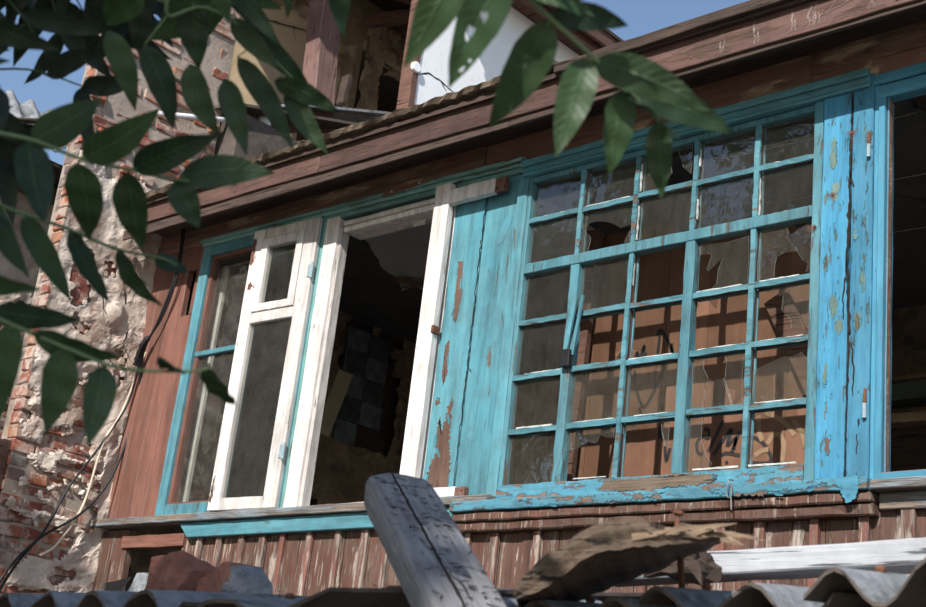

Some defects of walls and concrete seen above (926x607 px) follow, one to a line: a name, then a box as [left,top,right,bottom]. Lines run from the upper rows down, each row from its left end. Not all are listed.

peeling [829,137,837,169]
peeling [831,181,841,201]
flaking render [69,259,91,336]
flaking render [104,263,116,277]
peeling [365,218,432,291]
peeling [451,261,463,323]
peeling [531,196,595,263]
peeling [830,292,862,334]
crack [842,97,860,477]
peeling [442,340,450,387]
peeling [426,397,453,488]
peeling [518,473,859,507]